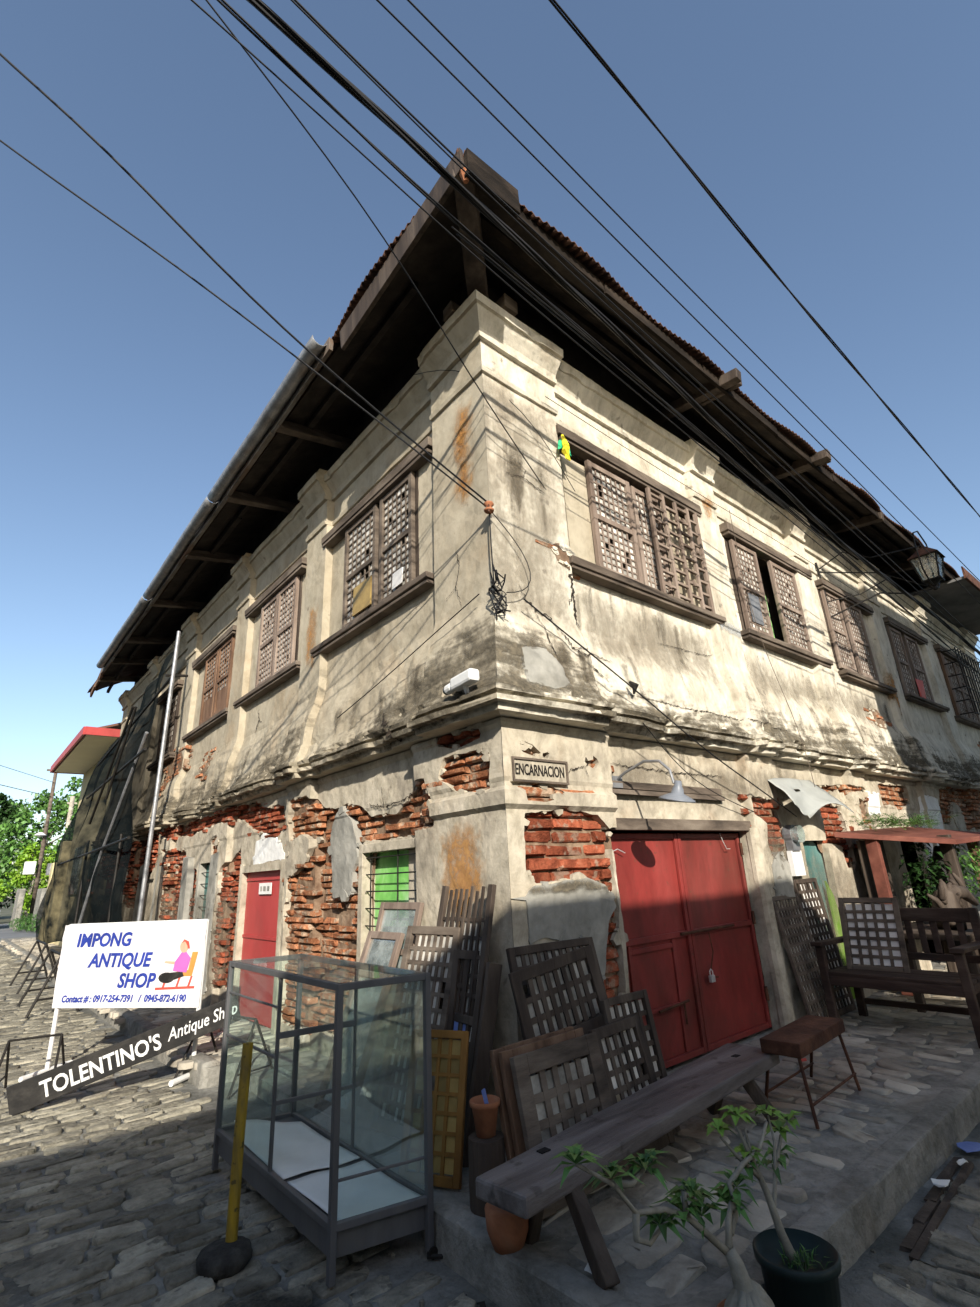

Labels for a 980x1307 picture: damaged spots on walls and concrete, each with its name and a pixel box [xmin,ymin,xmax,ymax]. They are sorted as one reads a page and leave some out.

rust [455,409,472,497]
damp [312,618,980,787]
damp [149,728,300,825]
flaking render [123,722,490,1038]
flaking render [518,782,613,892]
flaking render [816,783,909,868]
flaking render [939,786,980,831]
flaking render [596,912,629,1008]